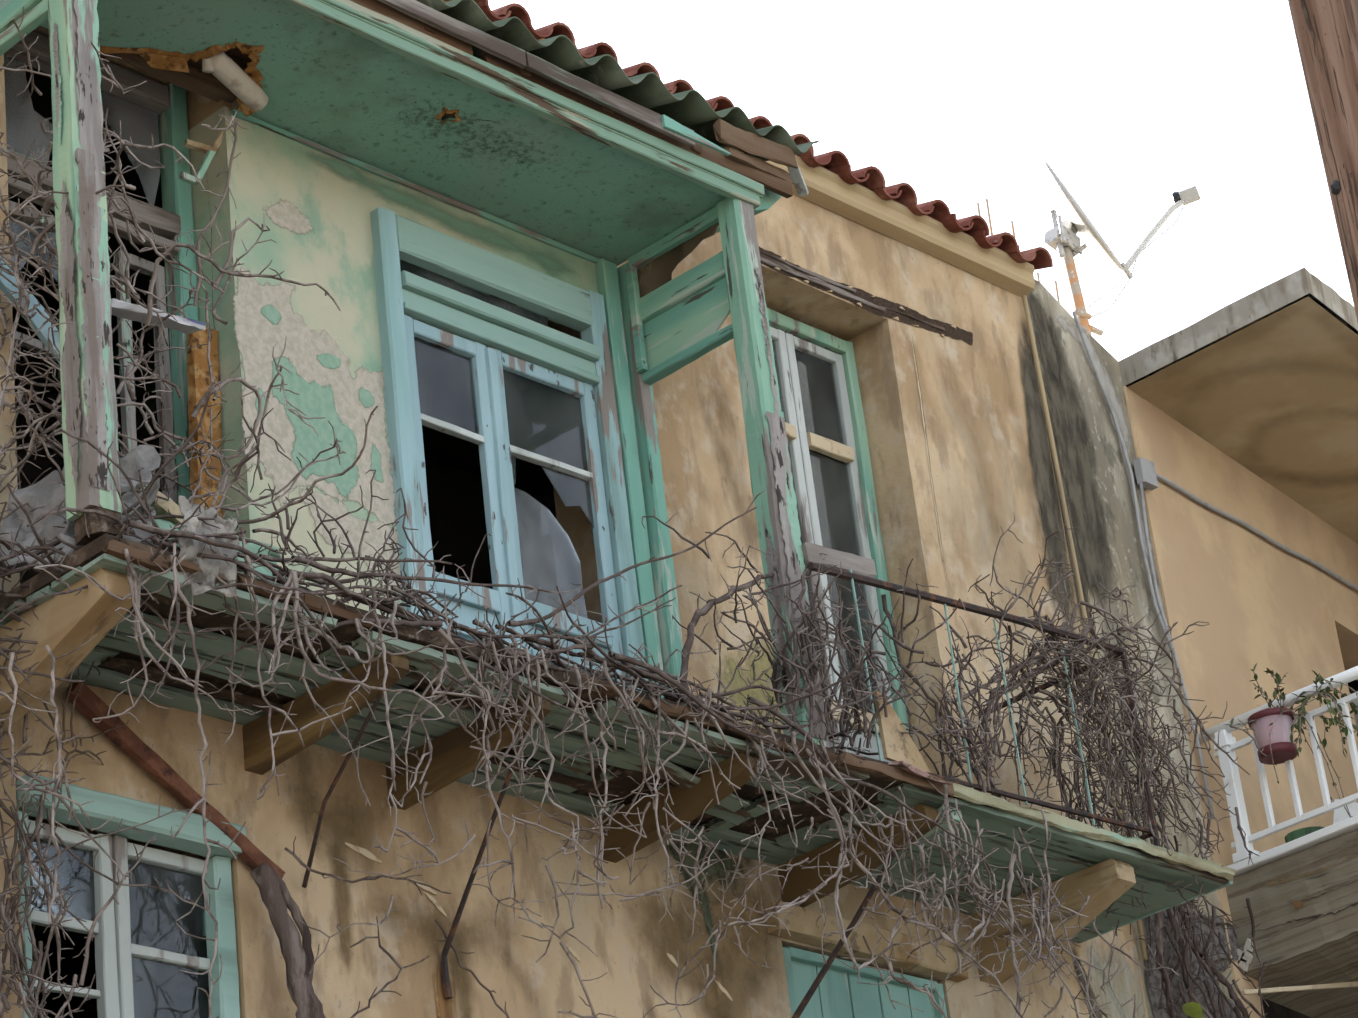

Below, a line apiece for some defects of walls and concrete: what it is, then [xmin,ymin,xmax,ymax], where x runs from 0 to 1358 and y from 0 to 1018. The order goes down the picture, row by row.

peeling [233,268,401,592]
damp [1020,293,1109,637]